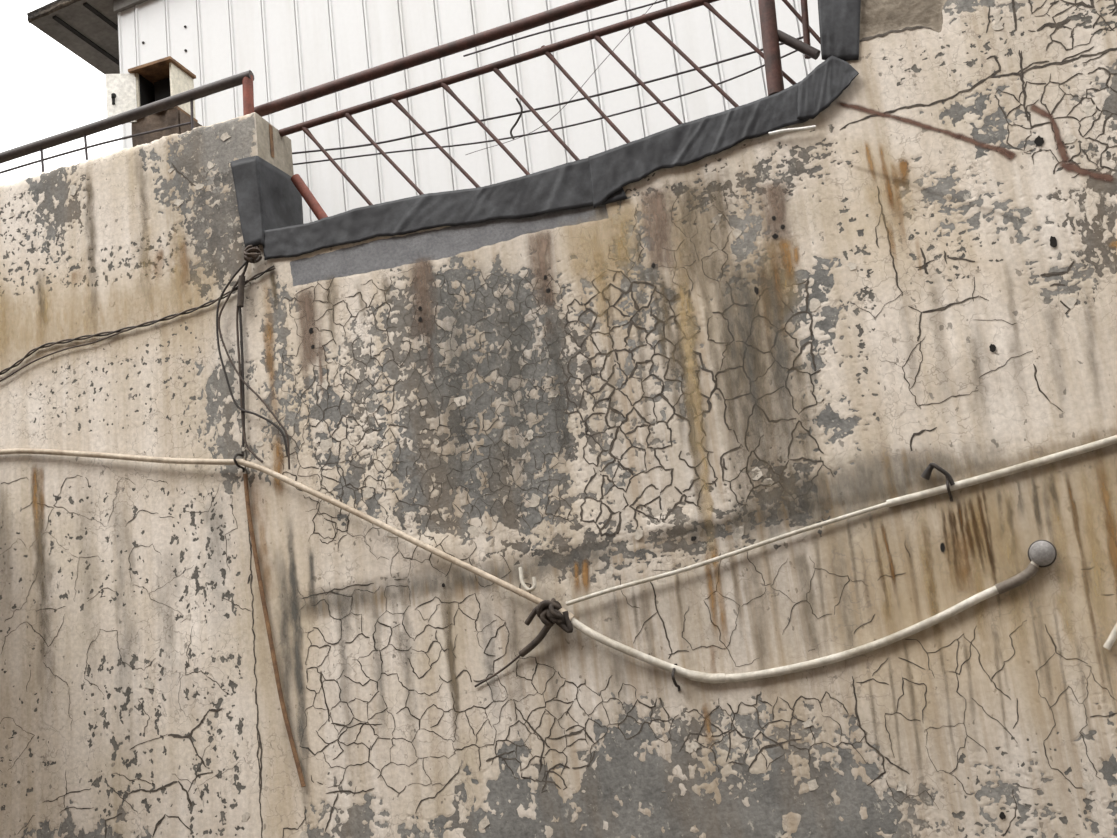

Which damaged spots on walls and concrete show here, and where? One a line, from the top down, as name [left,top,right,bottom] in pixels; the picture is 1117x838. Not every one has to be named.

peeling [0,113,266,305]
rust [765,186,798,304]
rust [866,145,907,205]
rust [838,102,1015,160]
crack [840,0,1117,178]
peeling [859,0,1117,318]
rust [1030,105,1113,182]
peeling [29,124,880,623]
rust [680,282,696,385]
rust [925,558,936,612]
rust [943,492,994,577]
peeling [300,691,1117,838]